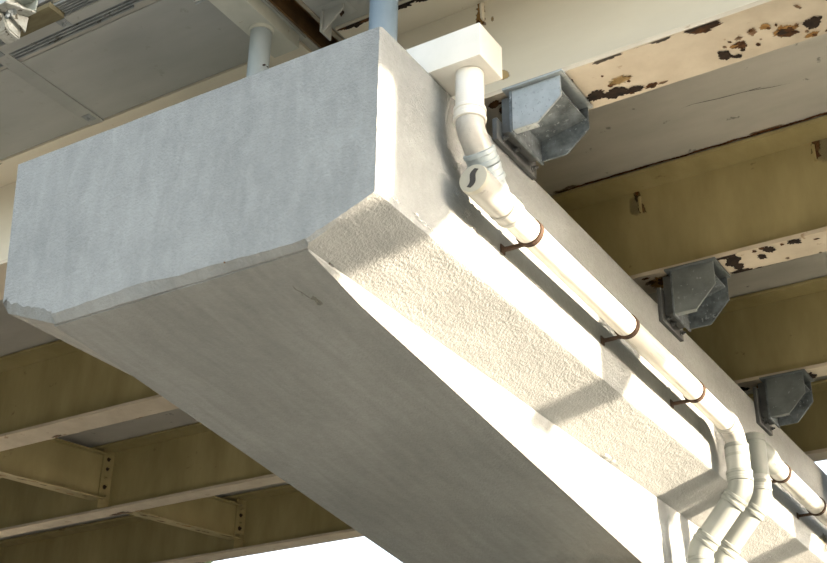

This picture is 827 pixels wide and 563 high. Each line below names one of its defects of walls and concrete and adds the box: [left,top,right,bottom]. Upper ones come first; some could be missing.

peeling [684,20,722,35]
peeling [802,16,822,38]
peeling [717,51,742,61]
peeling [587,80,668,102]
peeling [717,239,802,274]